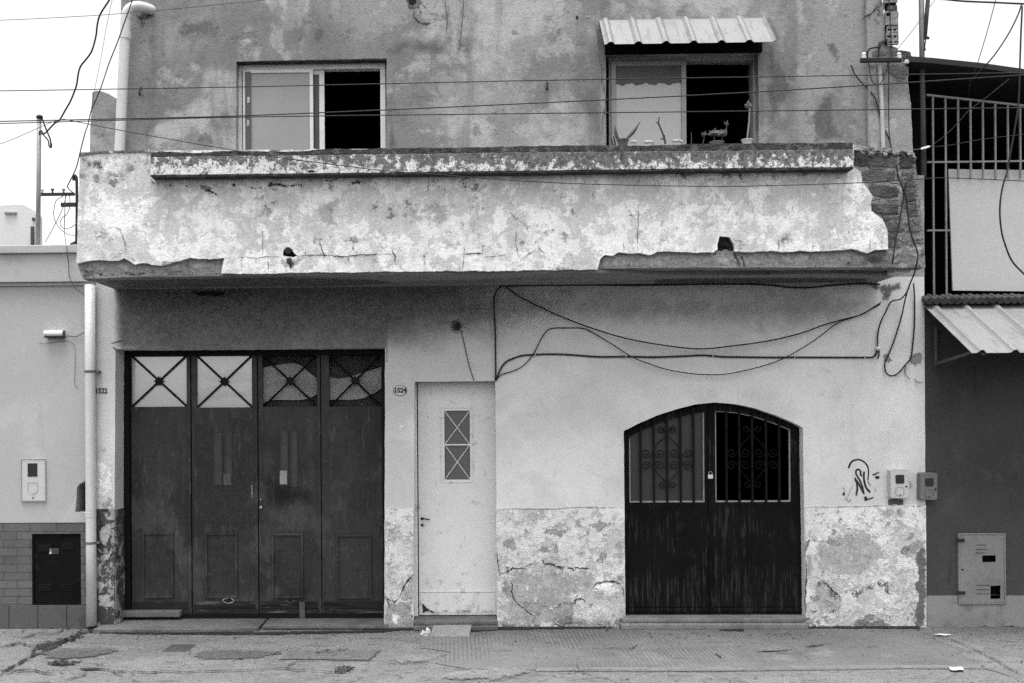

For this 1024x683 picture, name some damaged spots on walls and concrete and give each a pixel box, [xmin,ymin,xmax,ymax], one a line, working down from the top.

peeling [319,200,339,225]
peeling [405,202,459,245]
spalling [601,148,925,267]
peeling [97,460,113,508]
peeling [97,523,112,607]
crack [384,574,414,609]
peeling [386,601,413,628]
peeling [502,519,611,627]
crack [497,556,624,627]
peeling [804,499,904,613]